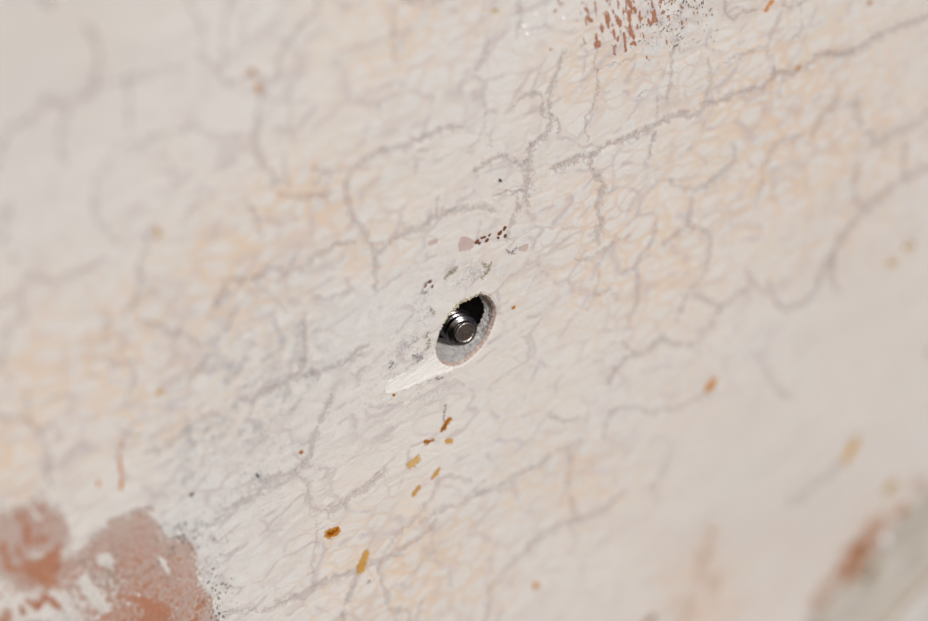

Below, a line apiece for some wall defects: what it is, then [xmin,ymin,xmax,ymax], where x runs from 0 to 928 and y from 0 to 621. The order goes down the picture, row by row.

peeling [577,0,717,55]
rust [424,417,453,445]
rust [325,526,341,539]
peeling [0,491,234,621]
rust [357,550,370,574]